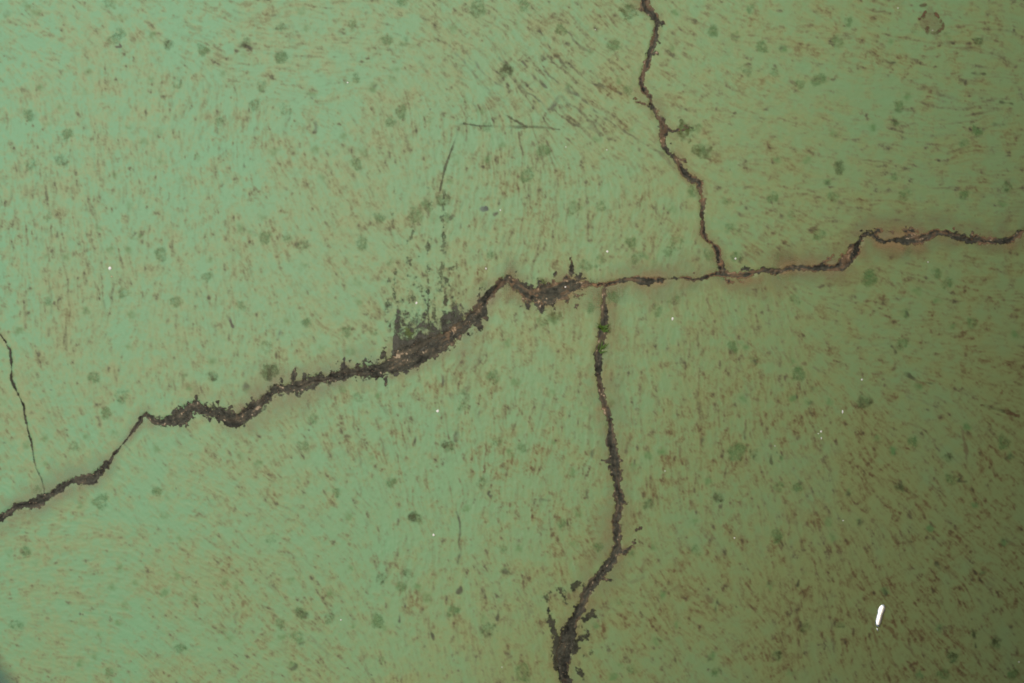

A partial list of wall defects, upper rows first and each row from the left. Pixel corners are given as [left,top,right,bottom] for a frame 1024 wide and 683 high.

crack [633,0,1024,284]
crack [0,257,665,683]